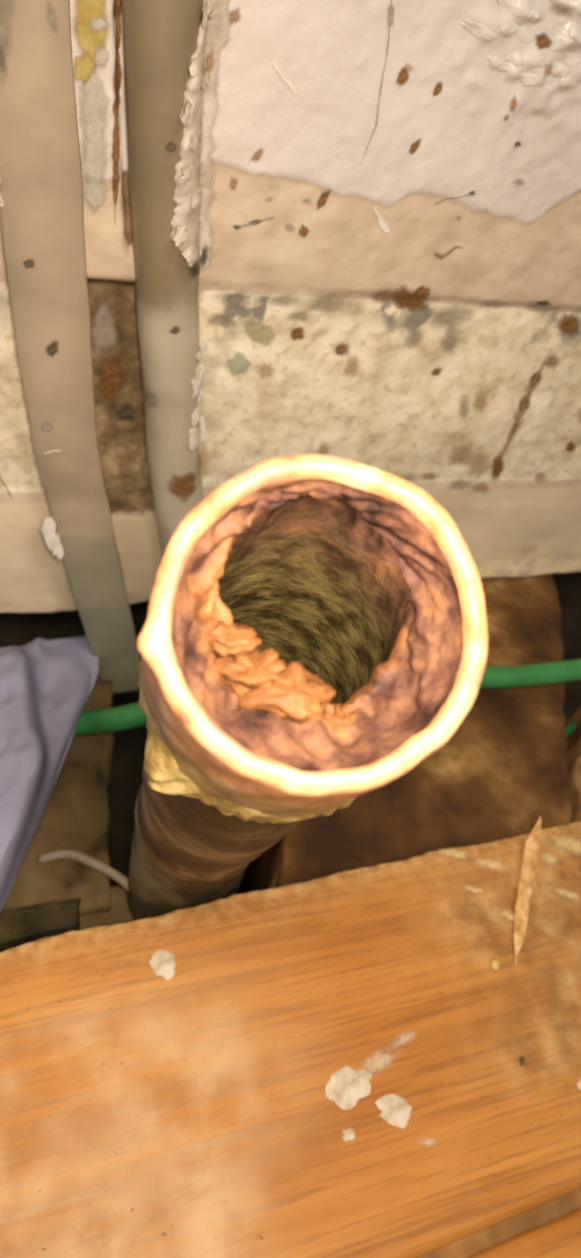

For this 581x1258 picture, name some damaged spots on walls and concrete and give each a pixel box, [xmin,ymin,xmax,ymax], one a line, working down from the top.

peeling [170,0,230,277]
water stain [274,297,337,319]
water stain [247,323,274,344]
water stain [438,311,458,347]
water stain [229,354,272,375]
corrosion [453,357,557,491]